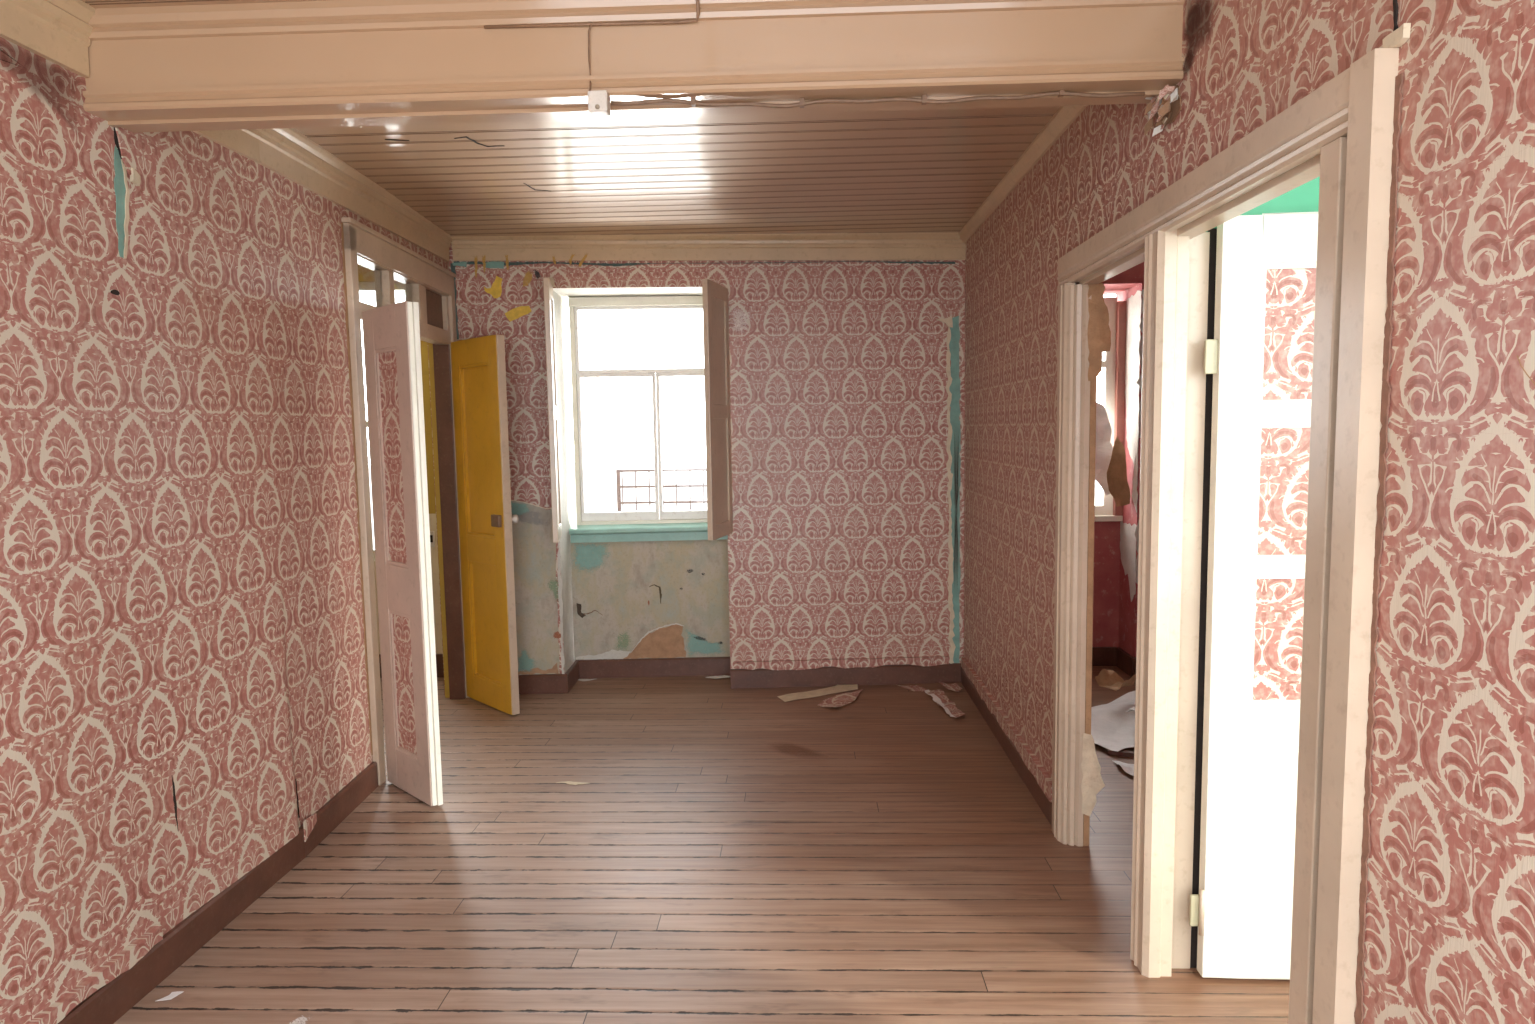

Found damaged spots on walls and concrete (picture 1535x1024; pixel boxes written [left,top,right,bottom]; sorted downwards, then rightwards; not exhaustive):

peeling [114,127,141,259]
spalling [1144,85,1182,137]
peeling [937,316,961,664]
flaking render [1120,289,1144,602]
flaking render [511,500,686,675]